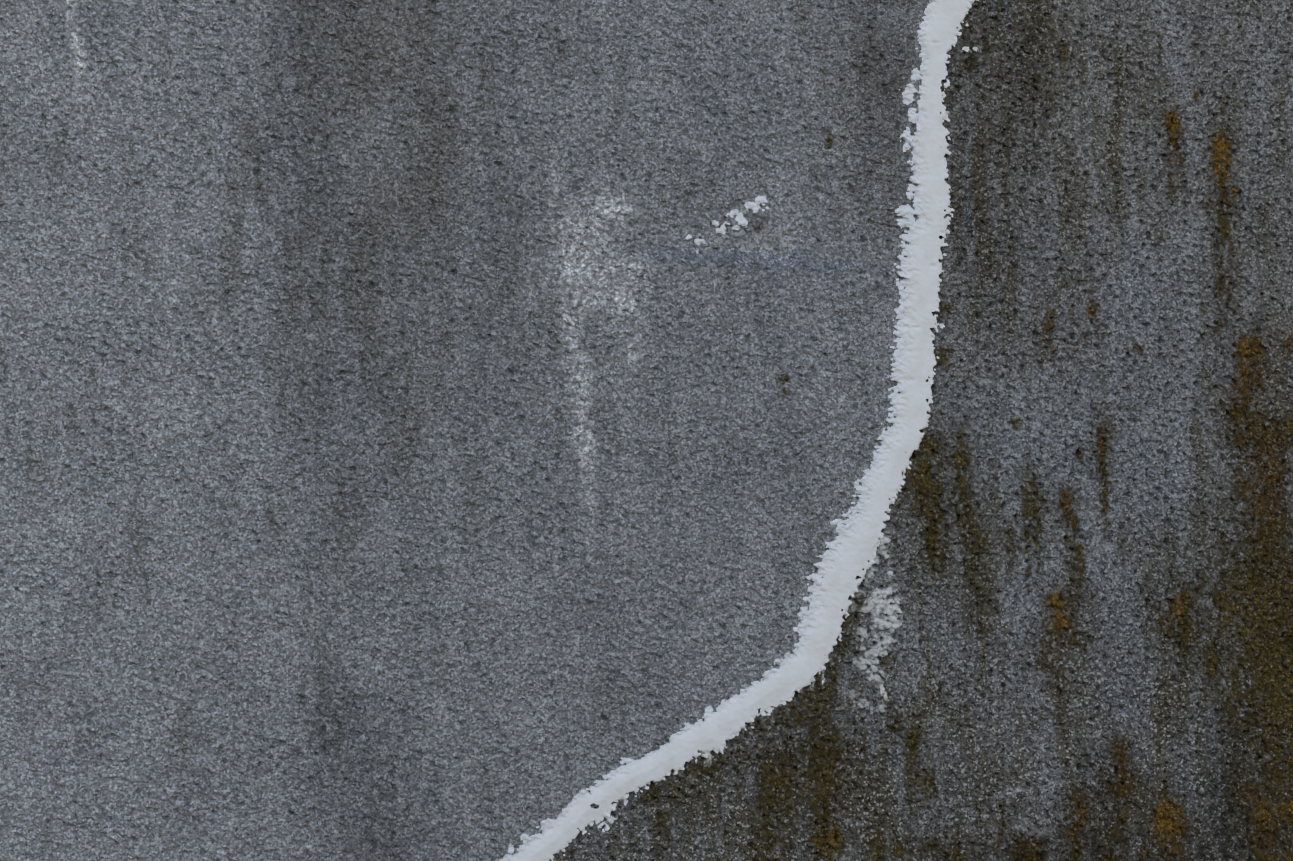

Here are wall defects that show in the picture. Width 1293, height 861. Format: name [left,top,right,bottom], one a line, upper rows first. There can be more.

rust [1163,110,1183,201]
rust [1202,132,1238,332]
rust [935,345,953,368]
crack [499,0,979,861]
rust [1075,426,1110,540]
rust [1228,335,1293,548]
rust [1036,489,1089,685]
rust [1158,584,1220,678]
rust [1105,739,1139,843]
rust [1140,799,1189,860]